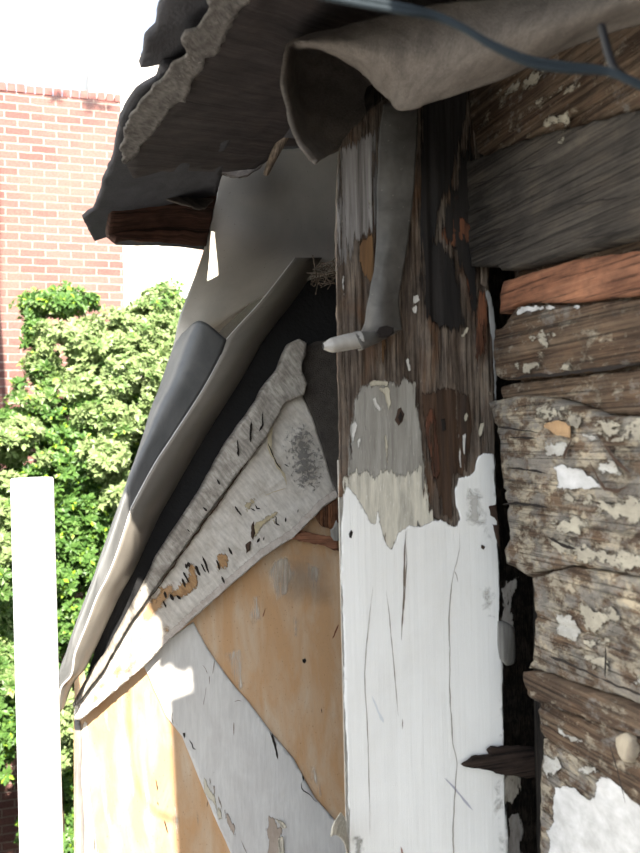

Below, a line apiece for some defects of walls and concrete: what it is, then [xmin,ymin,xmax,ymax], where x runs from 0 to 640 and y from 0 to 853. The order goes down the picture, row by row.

peeling [543,111,571,144]
peeling [336,127,380,282]
peeling [517,305,555,315]
peeling [513,329,562,373]
peeling [348,358,484,520]
peeling [489,505,500,548]
peeling [535,402,640,573]
crack [364,535,407,803]
crack [448,534,460,853]
peeling [538,602,622,675]
peeling [542,755,562,778]
peeling [546,766,640,853]